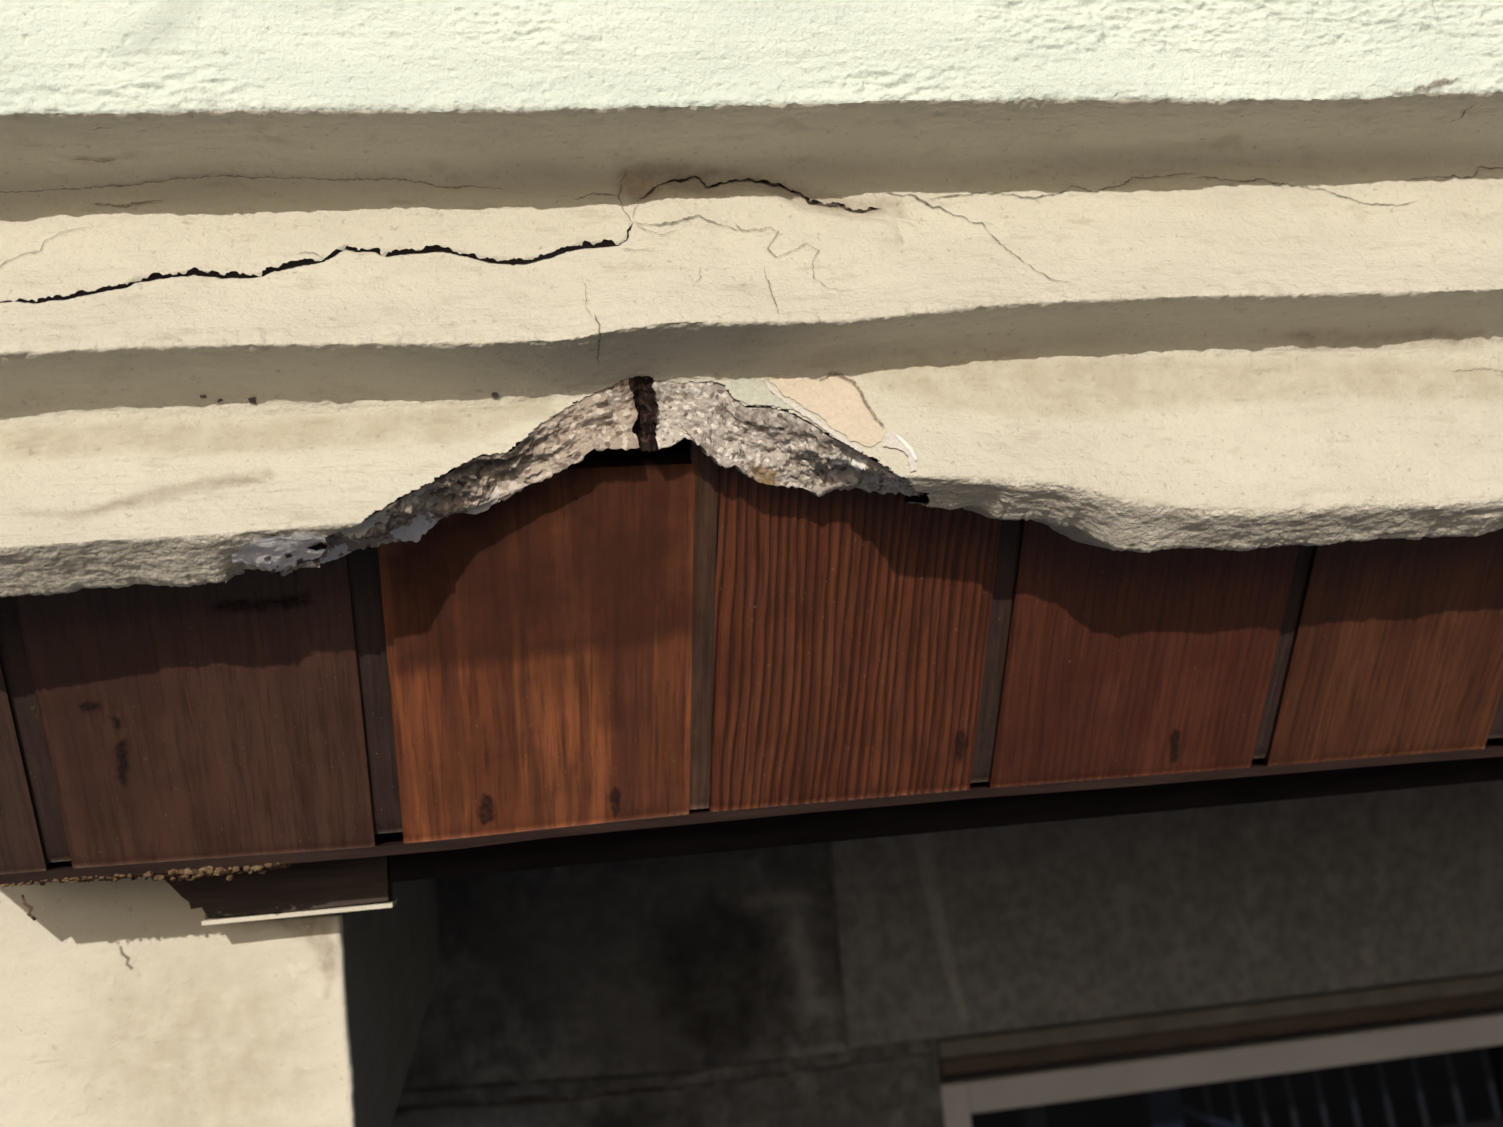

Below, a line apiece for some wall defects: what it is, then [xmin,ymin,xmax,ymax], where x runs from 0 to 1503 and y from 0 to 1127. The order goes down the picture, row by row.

crack [0,127,1500,362]
flaking render [225,371,924,583]